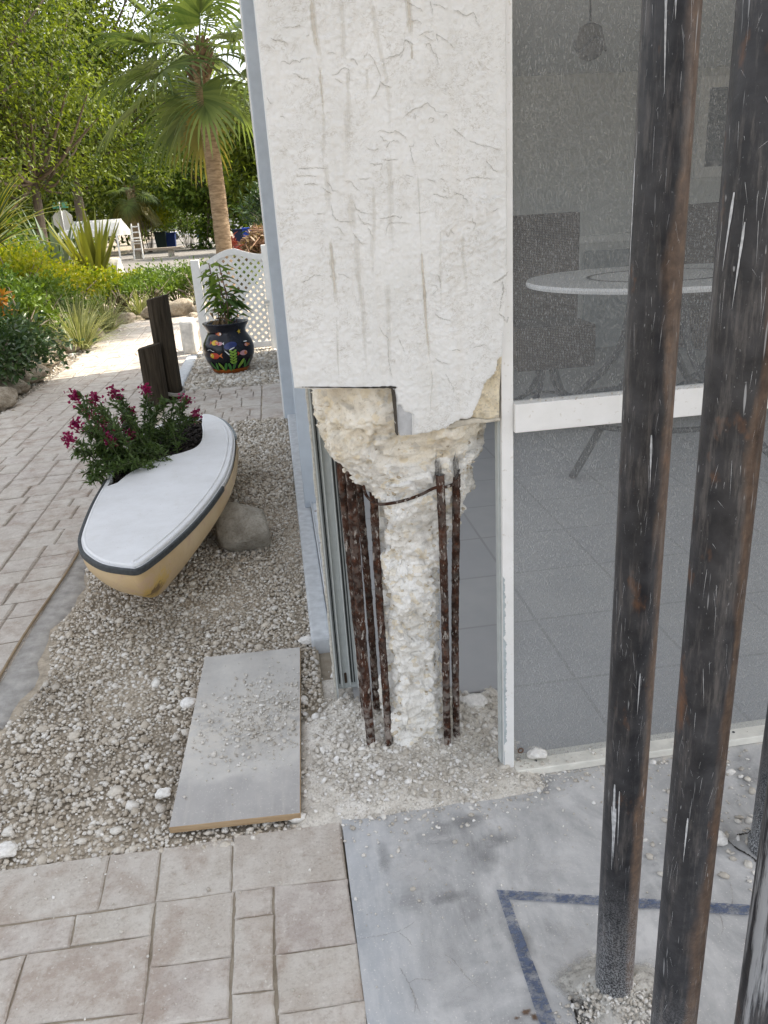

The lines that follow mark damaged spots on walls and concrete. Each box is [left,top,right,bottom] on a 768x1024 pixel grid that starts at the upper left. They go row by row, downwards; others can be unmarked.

crack [309,386,398,435]
corrosion [434,456,459,479]
spalling [310,356,502,748]